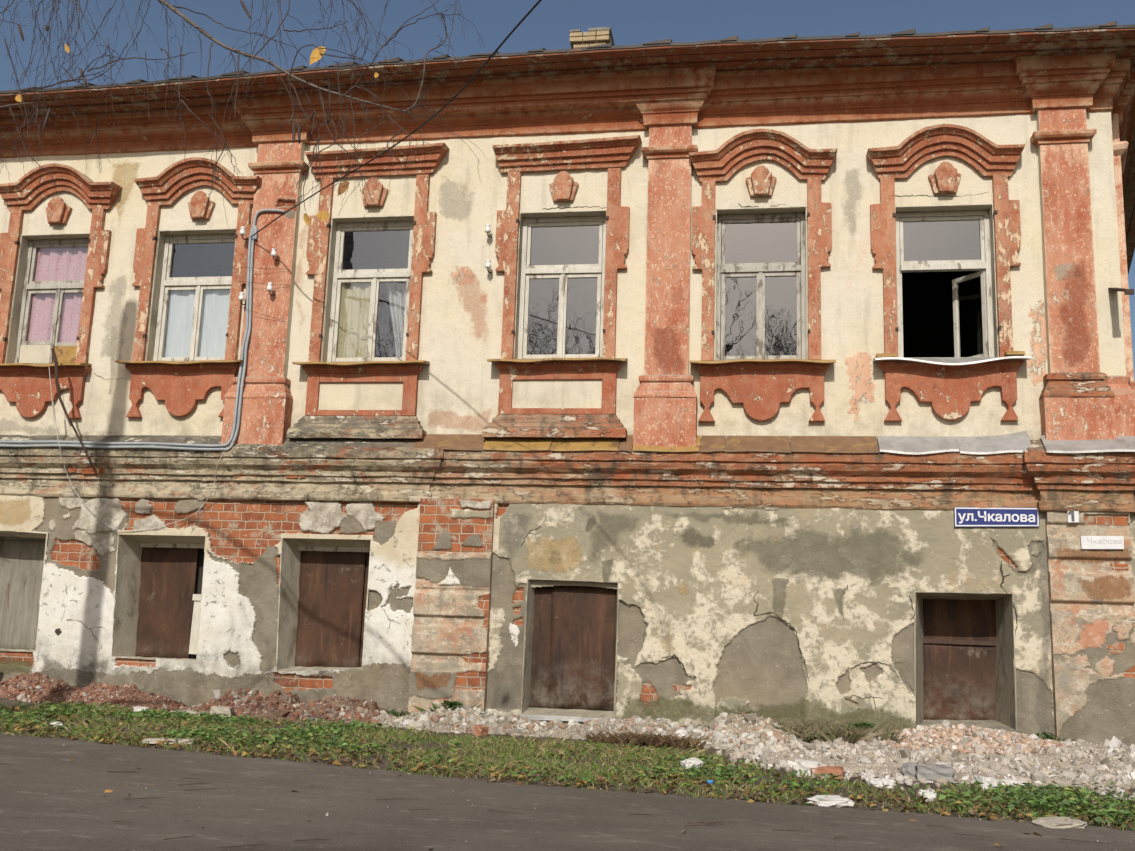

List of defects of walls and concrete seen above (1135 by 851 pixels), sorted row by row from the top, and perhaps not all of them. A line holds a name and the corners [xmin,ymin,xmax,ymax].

peeling [1026,299,1047,386]
flaking render [1083,514,1129,526]
flaking render [32,497,527,713]
flaking render [615,600,696,720]
flaking render [712,616,808,721]
flaking render [836,622,914,712]
flaking render [1013,615,1135,746]